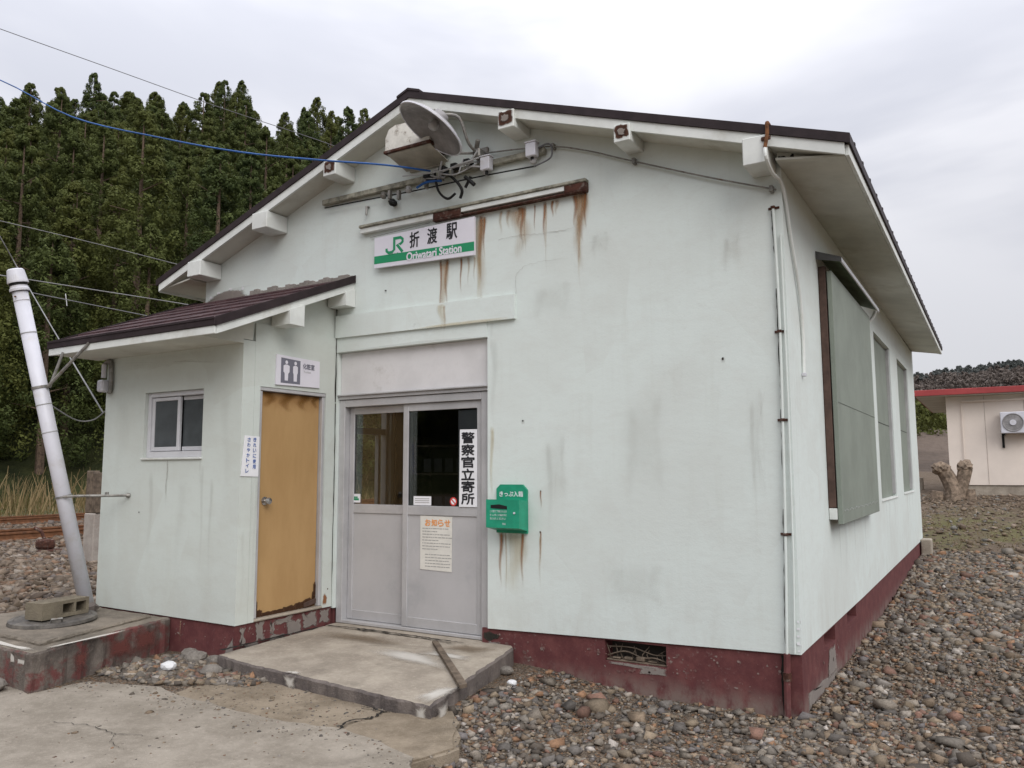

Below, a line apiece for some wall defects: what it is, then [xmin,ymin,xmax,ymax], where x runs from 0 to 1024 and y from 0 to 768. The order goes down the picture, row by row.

rust [433,181,589,250]
peeling [0,641,29,665]
peeling [220,598,330,653]
crack [337,706,394,730]